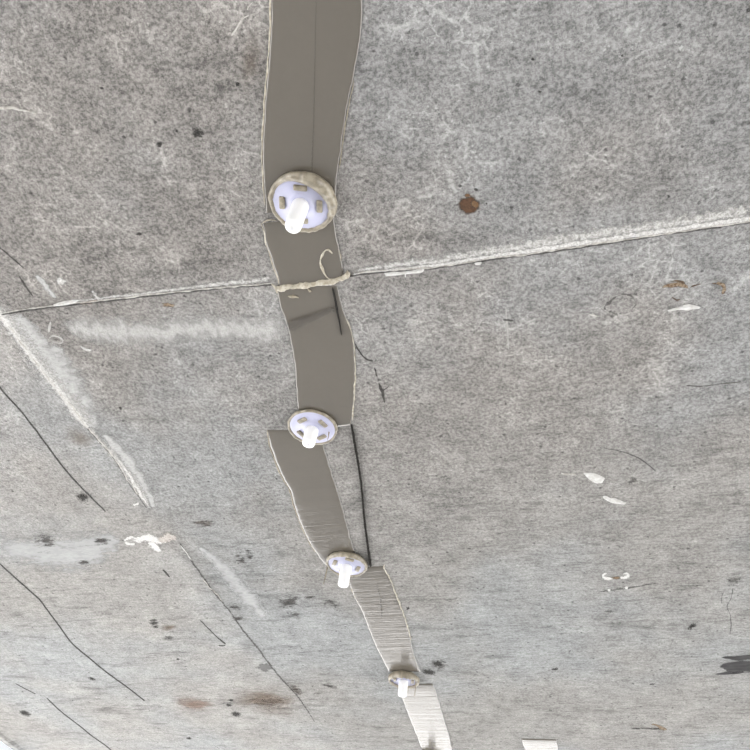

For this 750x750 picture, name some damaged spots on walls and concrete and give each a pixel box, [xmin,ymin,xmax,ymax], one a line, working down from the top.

corrosion [458,185,487,214]
crack [332,287,388,403]
crack [0,387,106,512]
peeling [124,532,177,552]
crack [351,424,372,567]
crack [0,563,145,701]
crack [15,683,111,750]